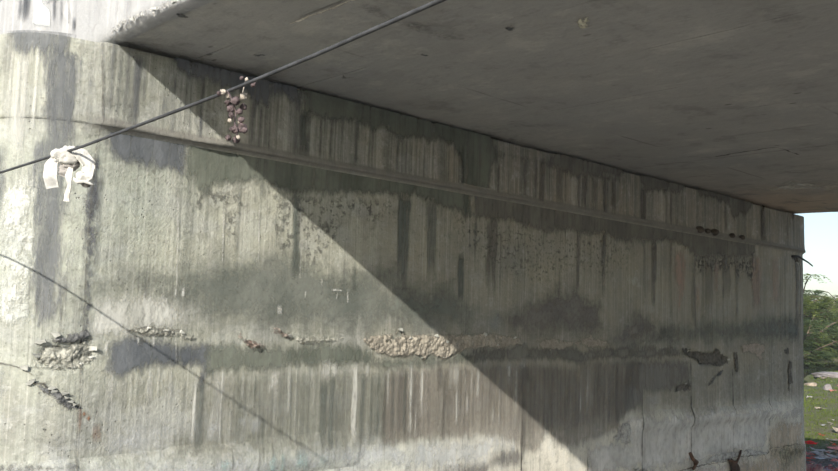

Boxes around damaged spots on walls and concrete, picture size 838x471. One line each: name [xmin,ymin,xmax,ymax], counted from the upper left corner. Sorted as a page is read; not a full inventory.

crack [94,61,104,161]
damp [84,160,99,273]
damp [110,57,755,332]
spalling [26,379,80,409]
spalling [20,330,97,370]
crack [33,264,87,421]
damp [81,285,797,471]
crack [639,391,647,470]
crack [684,396,714,470]
spalling [682,348,738,386]